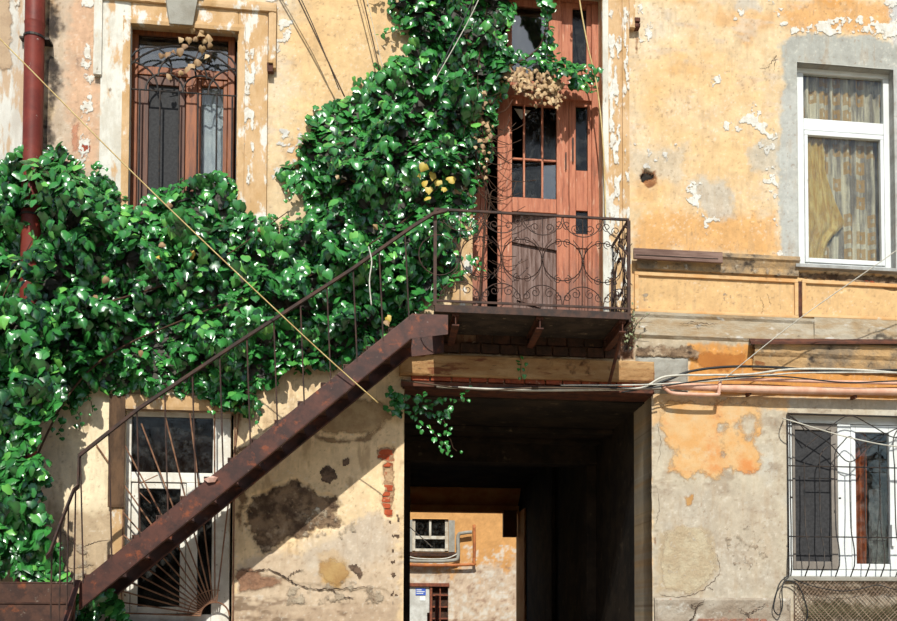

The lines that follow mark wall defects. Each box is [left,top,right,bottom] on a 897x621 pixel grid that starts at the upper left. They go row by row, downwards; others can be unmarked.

peeling [0,0,20,70]
damp [46,3,59,38]
peeling [768,0,897,39]
damp [43,55,61,145]
peeling [608,4,643,278]
peeling [635,345,761,480]
spalling [244,479,356,554]
spalling [320,457,349,484]
spalling [377,447,400,539]
spalling [236,568,280,591]
crack [241,568,367,599]
spalling [318,564,398,604]